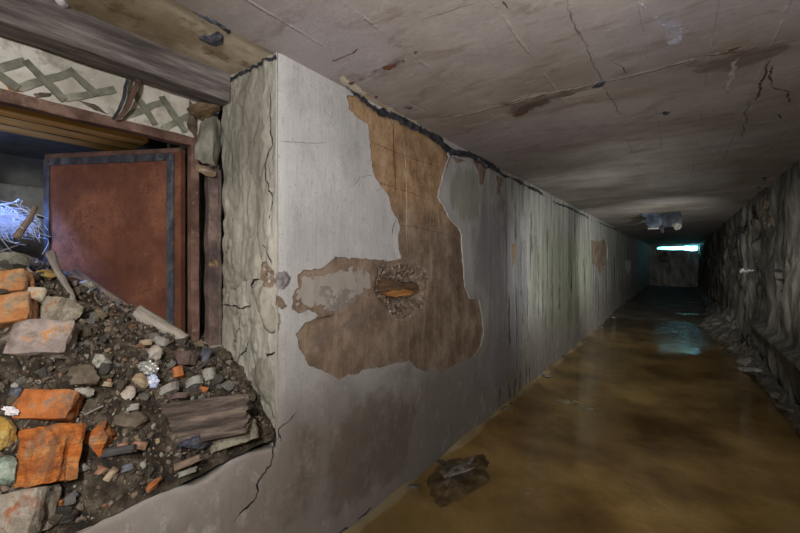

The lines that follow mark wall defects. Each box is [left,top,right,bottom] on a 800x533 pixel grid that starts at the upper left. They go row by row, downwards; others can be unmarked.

crack [454,0,791,138]
crack [264,87,304,218]
crack [346,87,630,237]
peeling [260,95,483,380]
peeling [591,239,607,273]
crack [233,414,295,522]